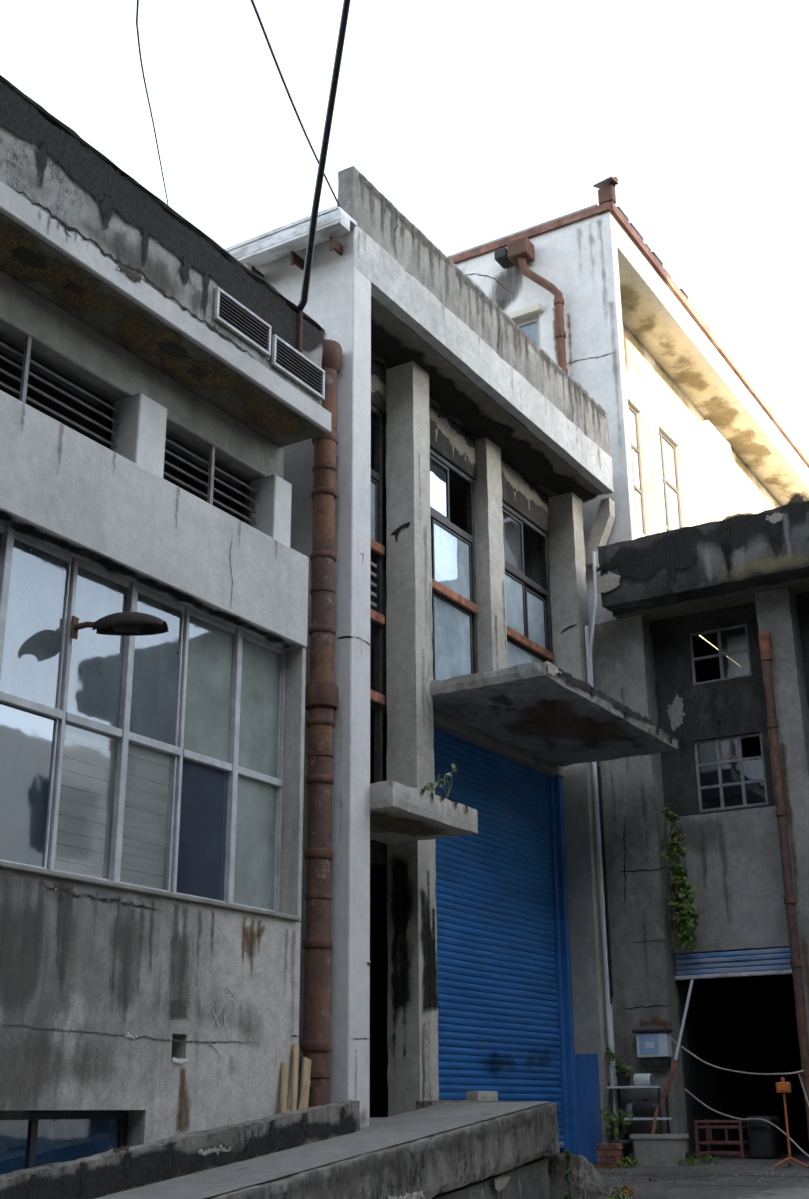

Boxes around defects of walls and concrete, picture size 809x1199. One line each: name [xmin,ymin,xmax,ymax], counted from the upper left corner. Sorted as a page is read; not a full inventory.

water stain [0,81,326,352]
spalling [117,263,144,283]
water stain [359,174,605,438]
water stain [620,287,636,310]
corrosion [553,308,572,365]
water stain [371,317,597,503]
water stain [661,343,771,465]
spalling [766,512,784,523]
spalling [597,571,621,594]
spalling [667,694,685,732]
corrosion [781,744,792,828]
corrosion [242,917,265,967]